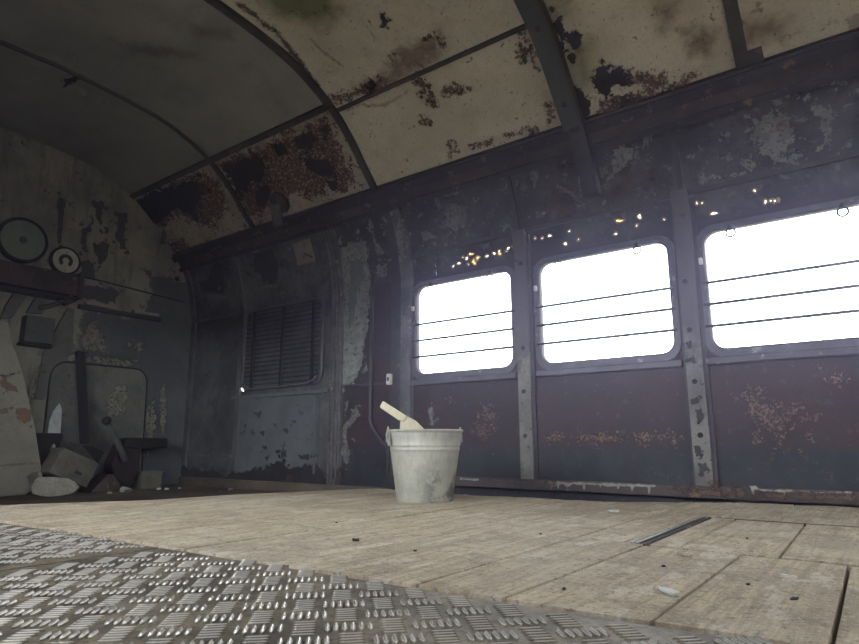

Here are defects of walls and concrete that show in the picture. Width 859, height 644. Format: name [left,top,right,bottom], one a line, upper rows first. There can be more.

corrosion [327,31,472,126]
corrosion [515,30,541,73]
corrosion [596,69,702,115]
corrosion [446,100,556,161]
peeling [704,88,838,184]
corrosion [216,116,363,230]
peeling [75,199,129,304]
peeling [338,217,412,470]
peeling [690,396,704,424]
peeling [181,431,326,484]
peeling [694,445,710,476]